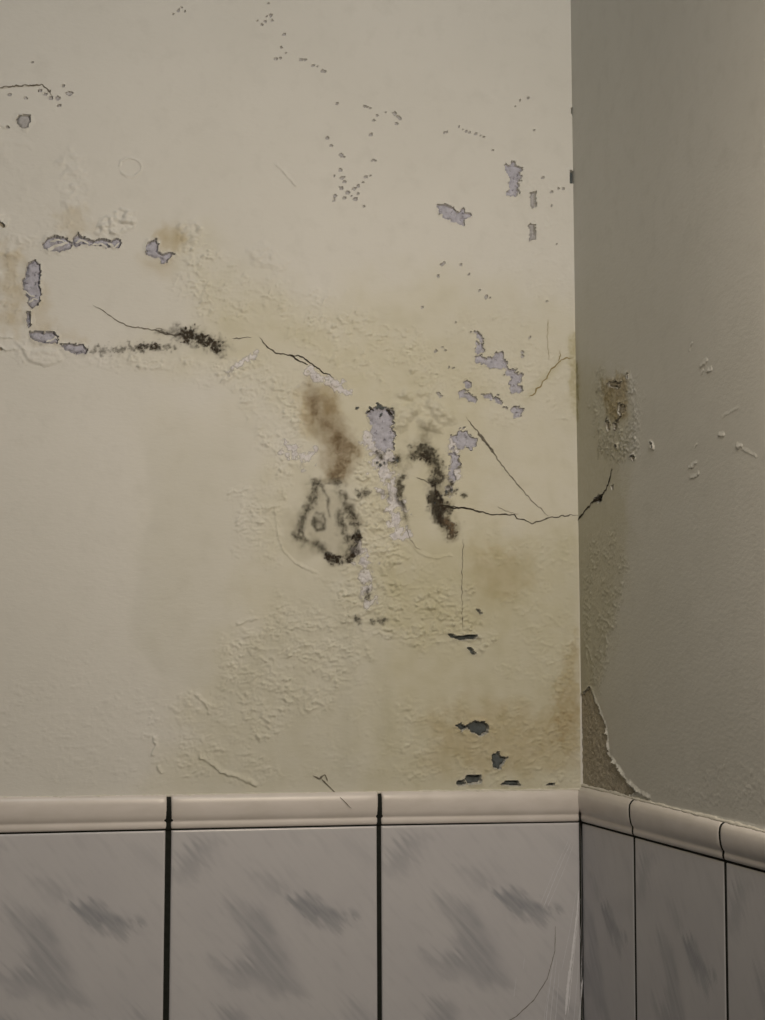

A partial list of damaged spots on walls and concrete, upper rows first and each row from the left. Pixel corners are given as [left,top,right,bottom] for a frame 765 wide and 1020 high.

spalling [324,135,379,208]
crack [93,305,182,338]
peeling [0,155,317,504]
crack [232,337,334,378]
peeling [432,157,655,504]
crack [529,324,573,397]
crack [444,419,612,524]
damp [316,430,467,624]
peeling [203,400,637,797]
crack [458,544,466,627]